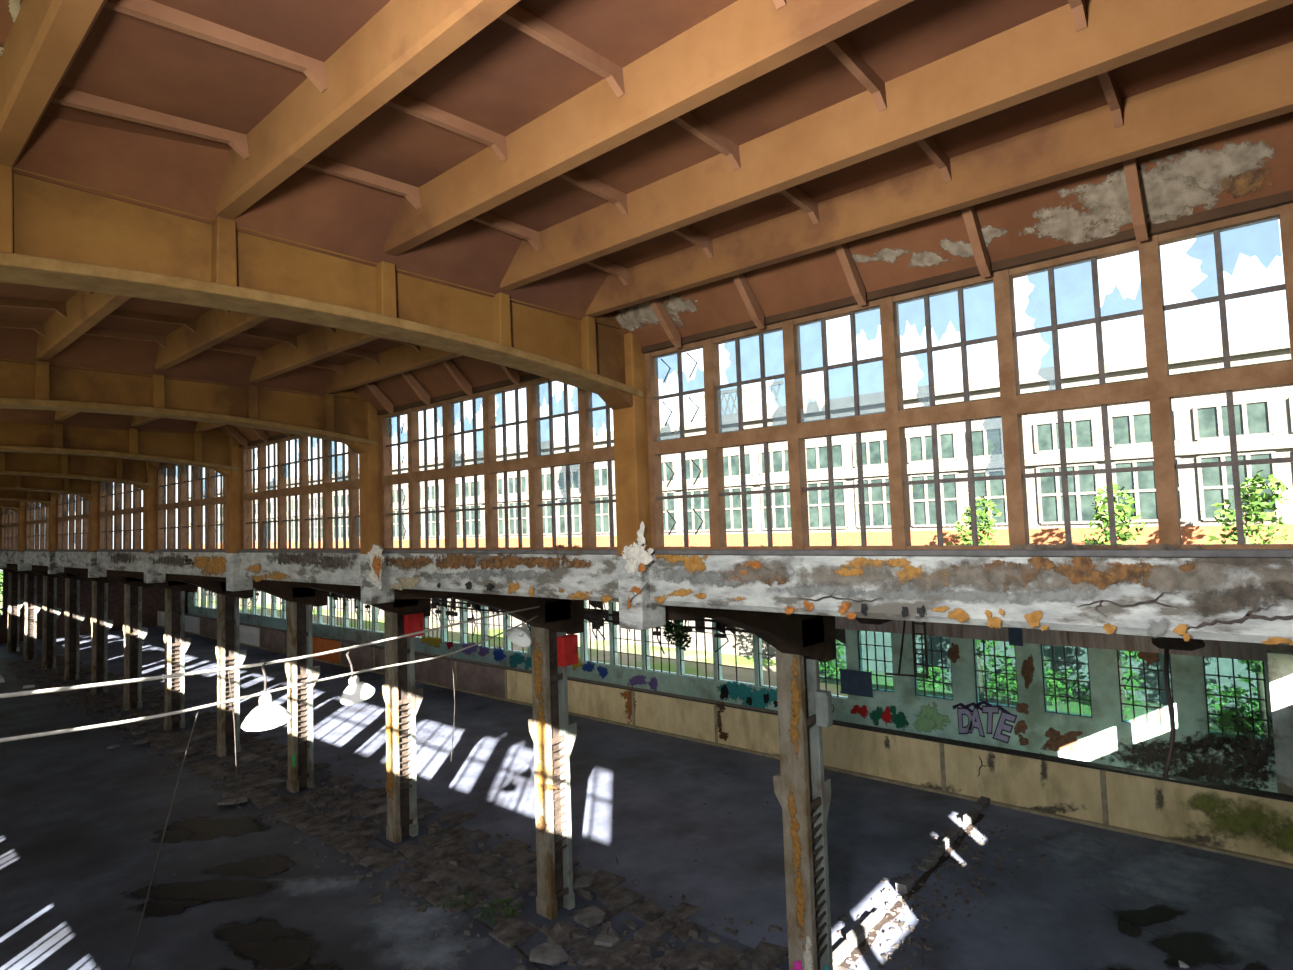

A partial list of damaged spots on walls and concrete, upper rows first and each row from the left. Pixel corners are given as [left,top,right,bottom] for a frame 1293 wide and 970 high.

peeling [8,0,21,22]
peeling [851,141,1276,268]
peeling [622,521,655,574]
spalling [267,544,595,592]
spalling [834,556,1199,592]
spalling [901,605,927,617]
crack [1077,592,1293,630]